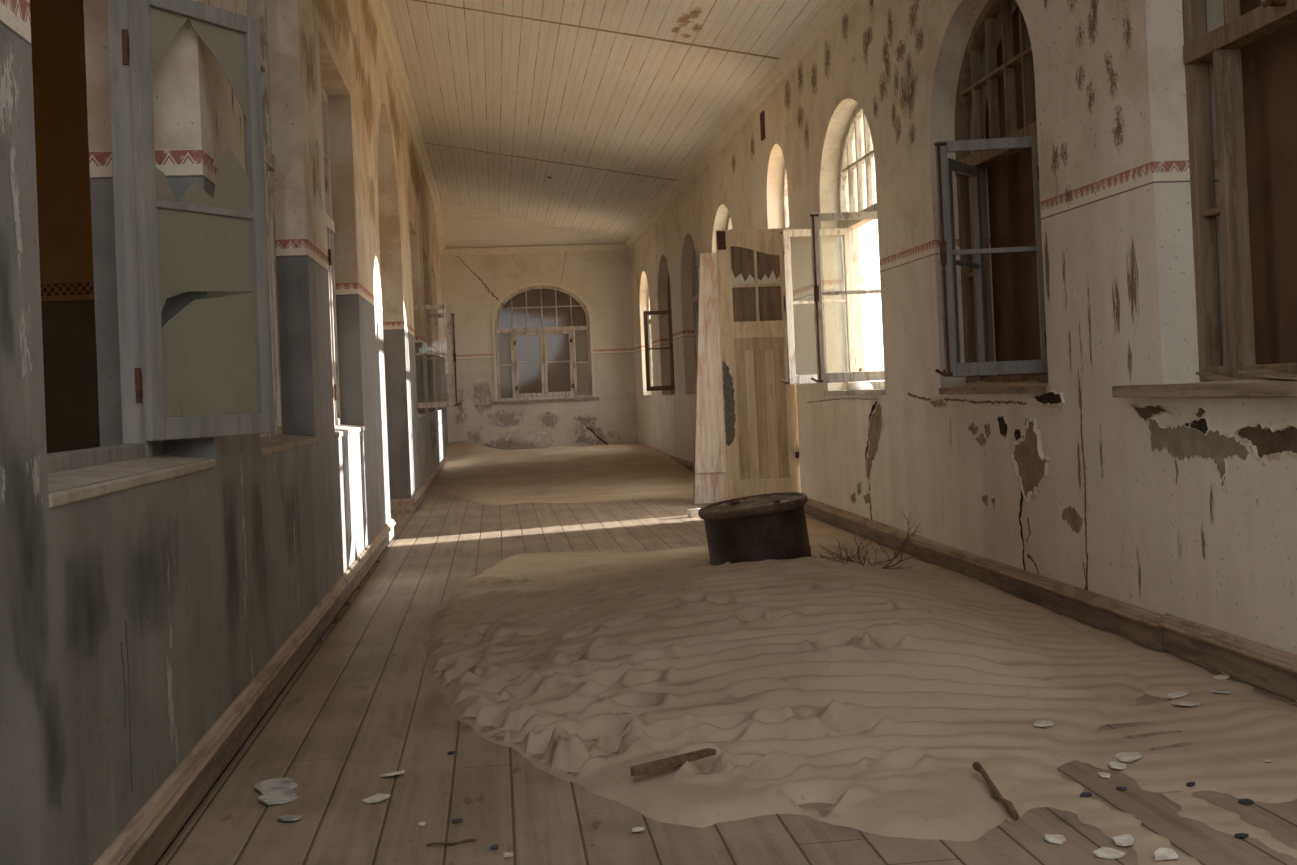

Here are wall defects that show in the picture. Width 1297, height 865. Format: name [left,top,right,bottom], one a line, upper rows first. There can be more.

leakage [784,44,830,150]
leakage [842,0,924,144]
leakage [457,382,557,450]
spalling [850,401,885,520]
spalling [908,390,1065,575]
spalling [1062,504,1084,536]
flaking render [1131,403,1297,487]
crack [121,621,133,793]